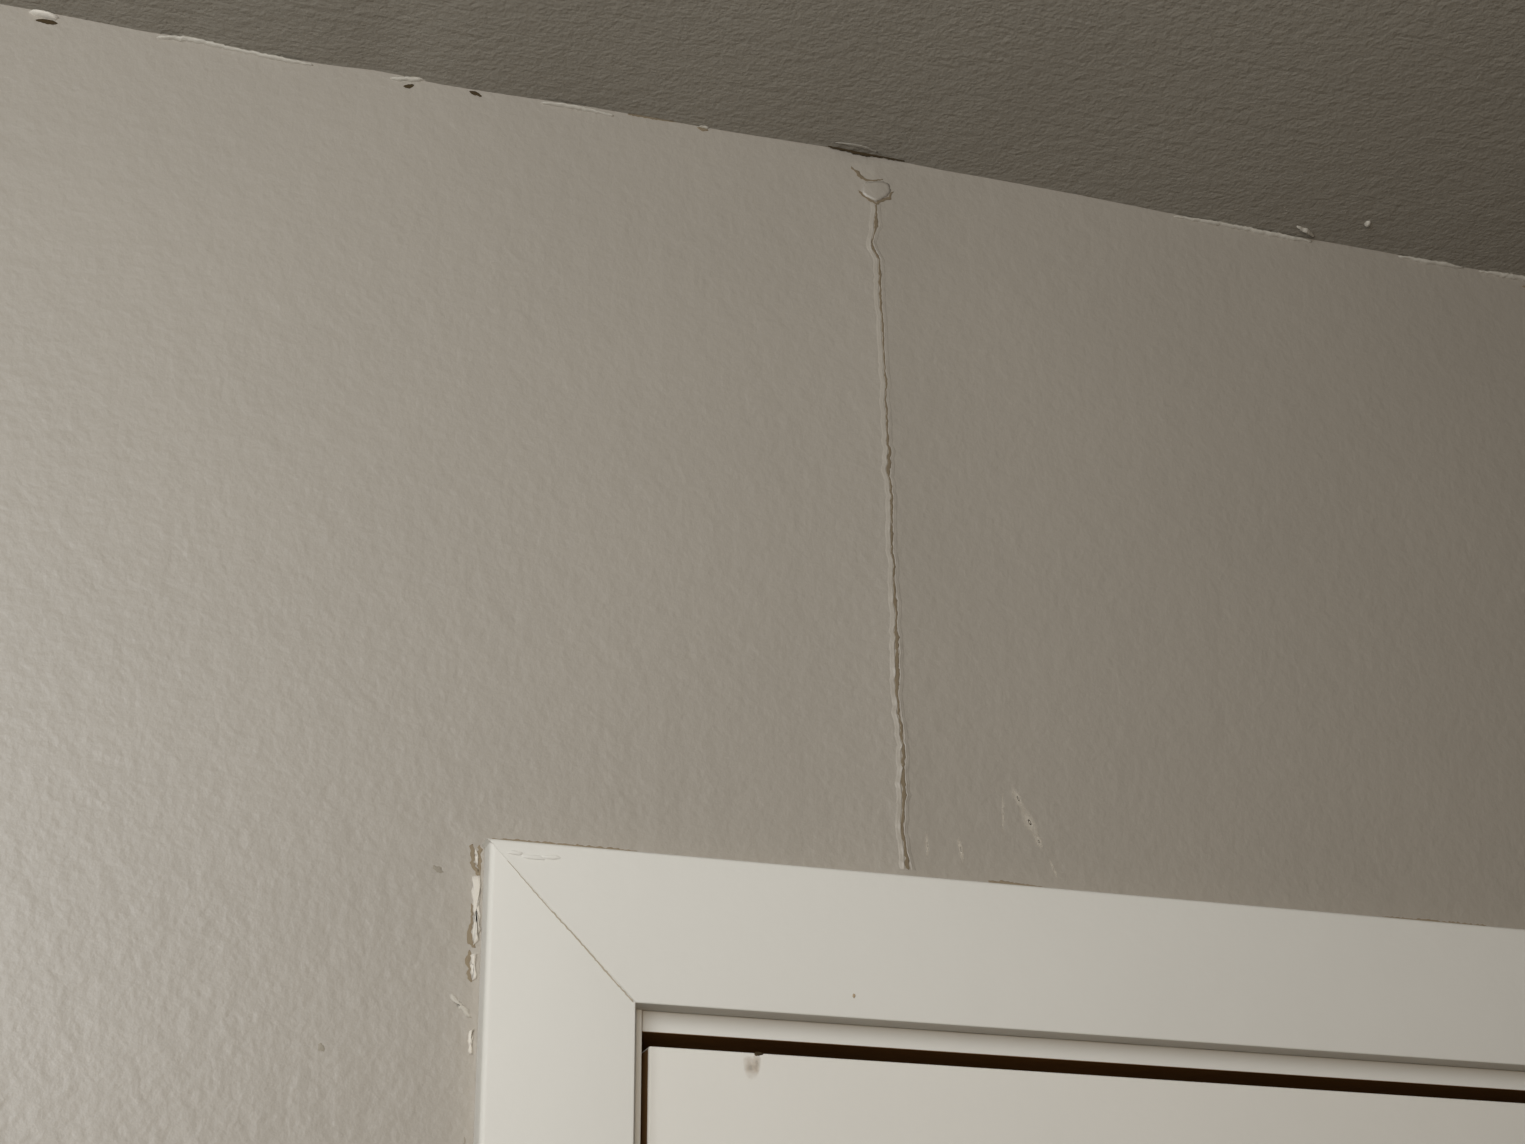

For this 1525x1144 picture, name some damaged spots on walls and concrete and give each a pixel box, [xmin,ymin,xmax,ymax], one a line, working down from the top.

crack [828,142,916,870]